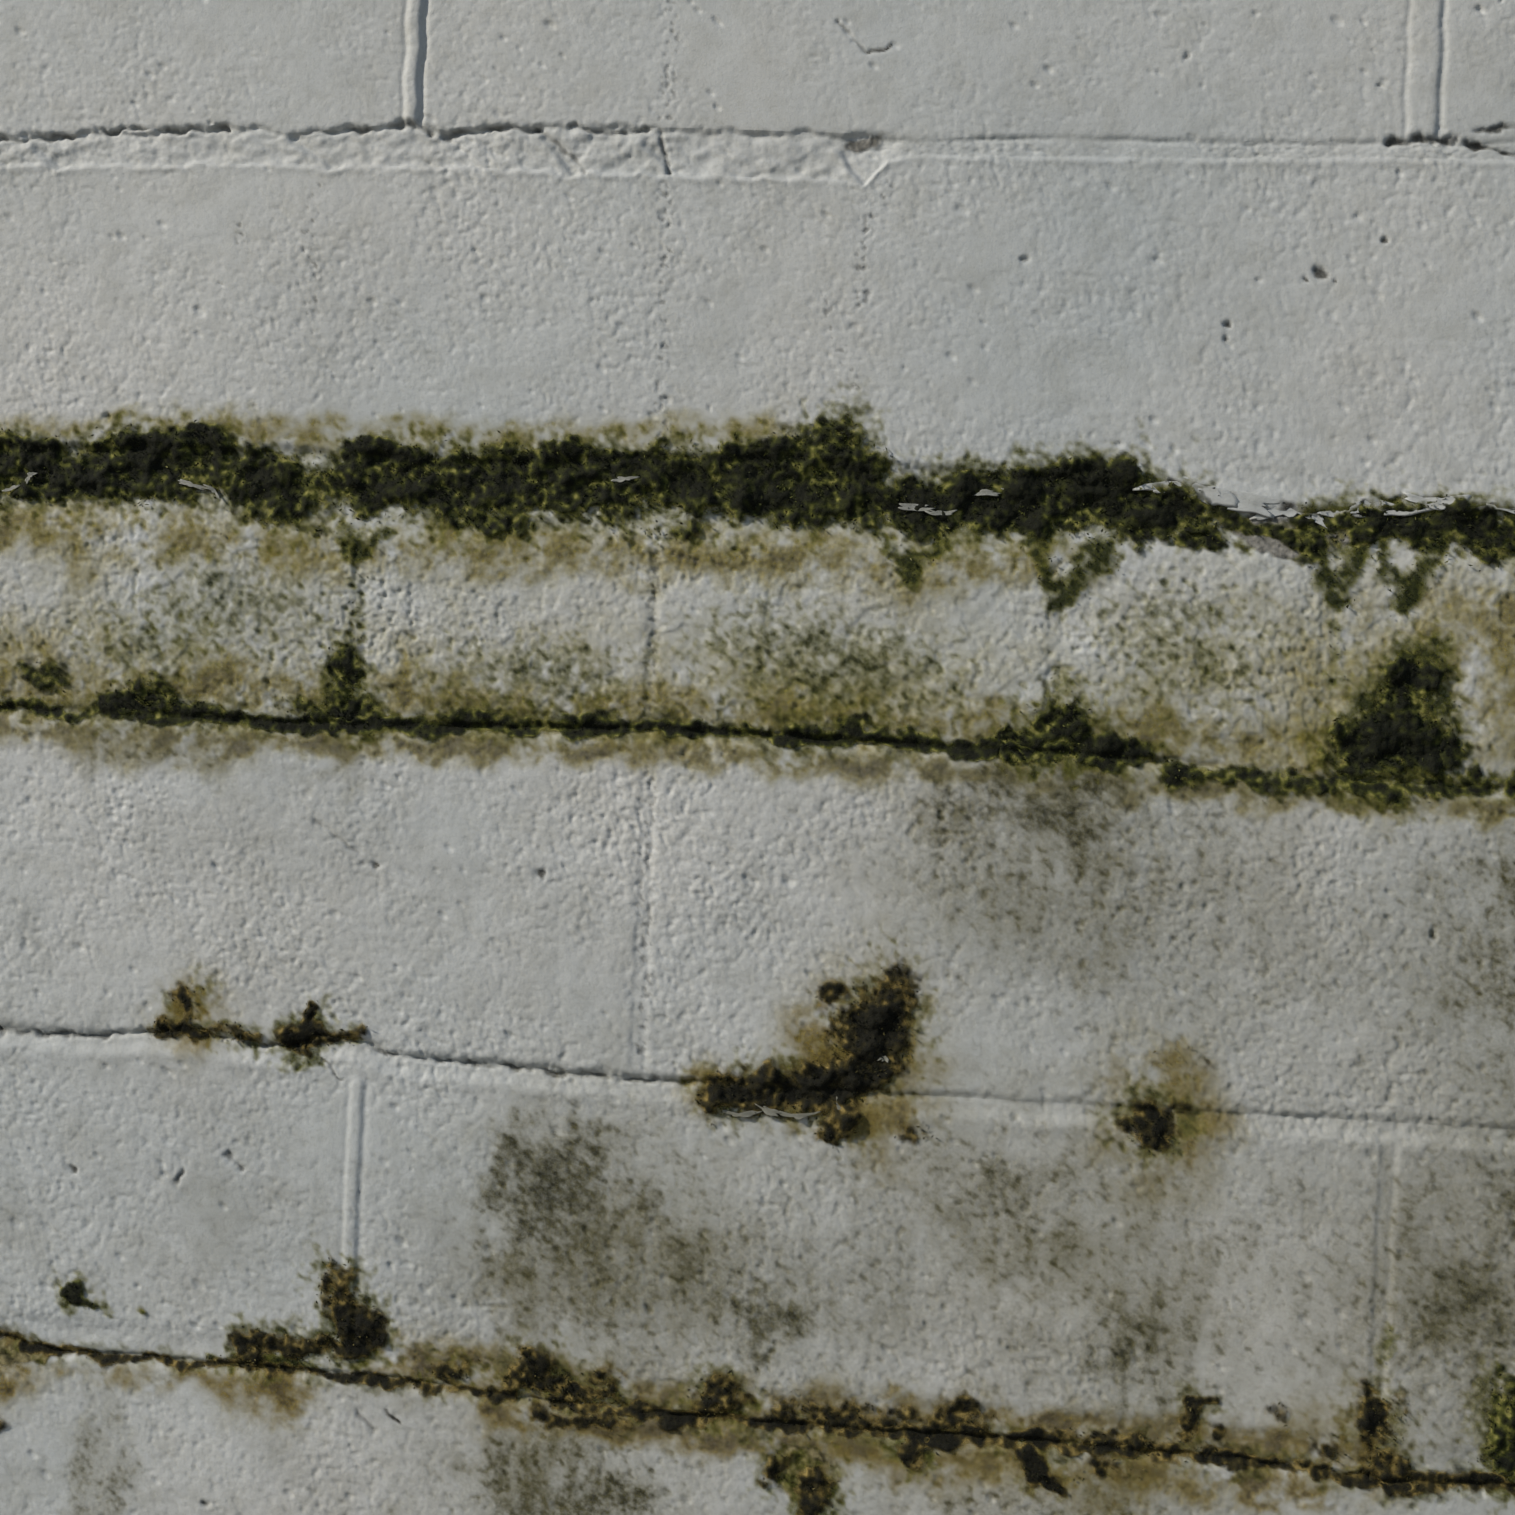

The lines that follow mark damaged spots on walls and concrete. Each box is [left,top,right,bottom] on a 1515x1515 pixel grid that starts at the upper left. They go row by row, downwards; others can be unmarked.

crack [1386,125,1508,155]
damp [219,415,338,445]
damp [921,541,1056,588]
peeling [1133,477,1515,560]
damp [0,504,1026,782]
damp [912,605,1328,897]
damp [1327,794,1409,816]
damp [1426,795,1514,824]
damp [481,1104,663,1327]
damp [666,1231,818,1370]
damp [1081,1280,1172,1405]
damp [1390,1164,1515,1387]